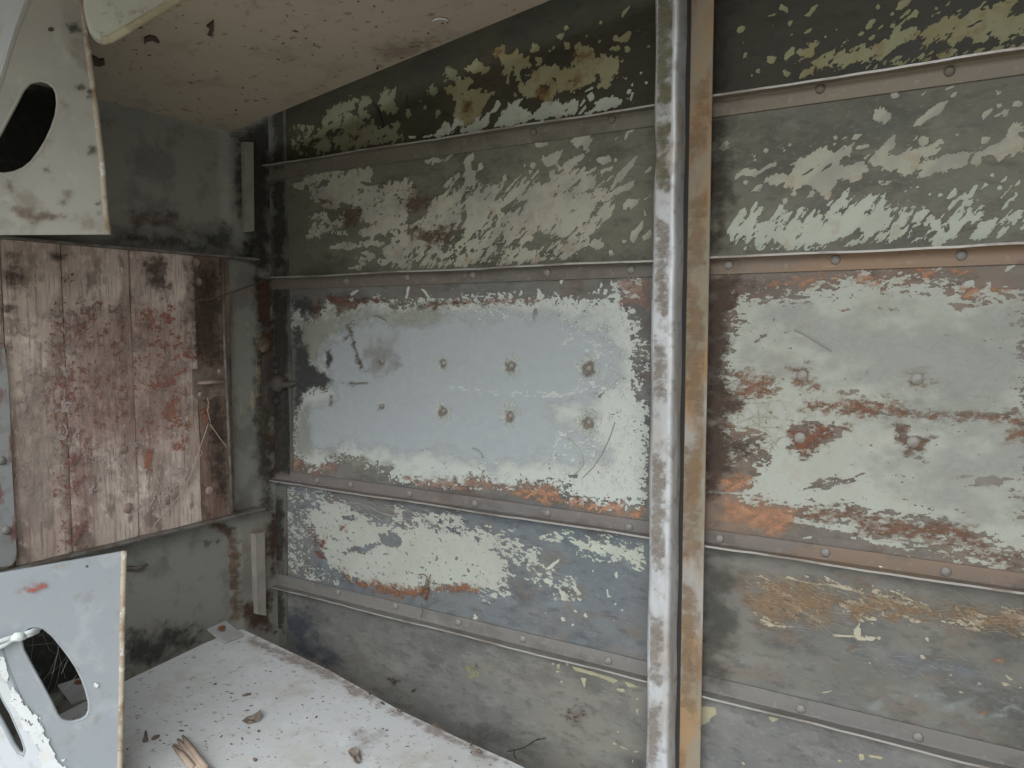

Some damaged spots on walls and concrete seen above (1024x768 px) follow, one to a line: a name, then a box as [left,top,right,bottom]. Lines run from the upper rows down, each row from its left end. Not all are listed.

peeling [289,25,648,157]
peeling [293,135,652,270]
corrosion [617,217,669,317]
peeling [727,86,1024,251]
peeling [291,277,650,512]
corrosion [683,277,796,556]
peeling [705,266,1024,572]
corrosion [787,368,943,456]
corrosion [347,575,478,599]
peeling [287,486,647,626]
corrosion [404,456,666,569]
corrosion [808,507,984,558]